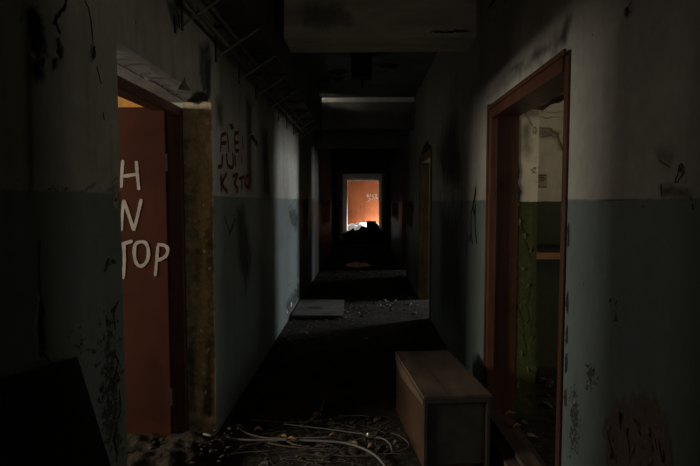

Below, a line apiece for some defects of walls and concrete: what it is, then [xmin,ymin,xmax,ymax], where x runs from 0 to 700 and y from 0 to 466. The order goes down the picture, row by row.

crack [49,0,67,72]
crack [85,1,102,84]